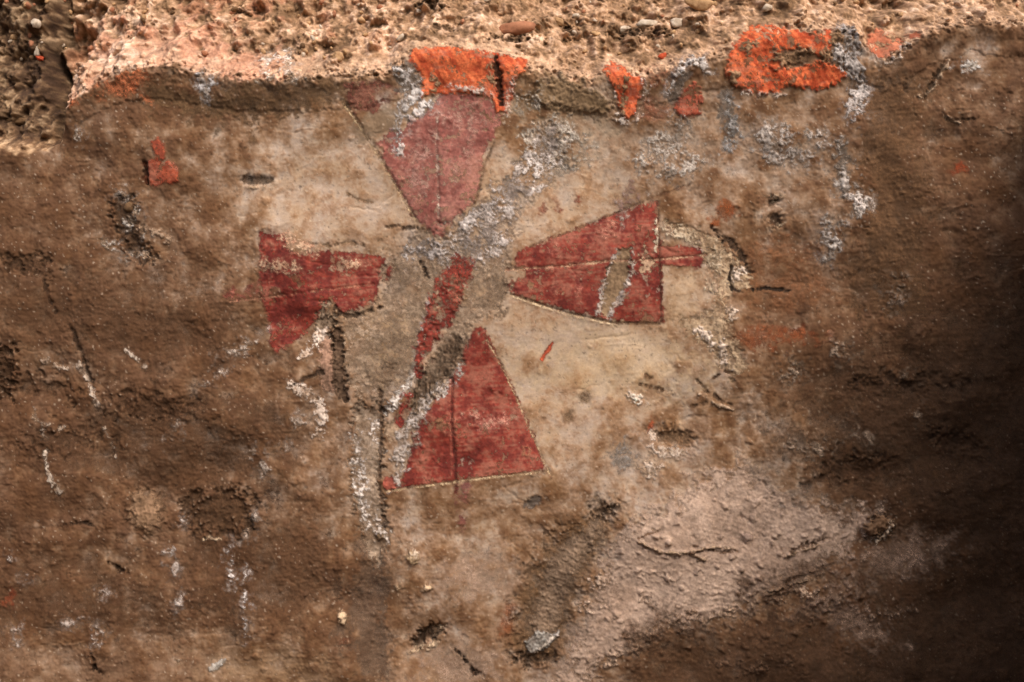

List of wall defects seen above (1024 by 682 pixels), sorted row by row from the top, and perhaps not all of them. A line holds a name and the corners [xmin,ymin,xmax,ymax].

water stain [392,60,434,156]
flaking render [409,46,527,116]
flaking render [603,61,649,125]
flaking render [674,81,704,118]
flaking render [725,24,848,98]
flaking render [866,28,921,63]
water stain [518,116,598,173]
water stain [611,24,1024,682]